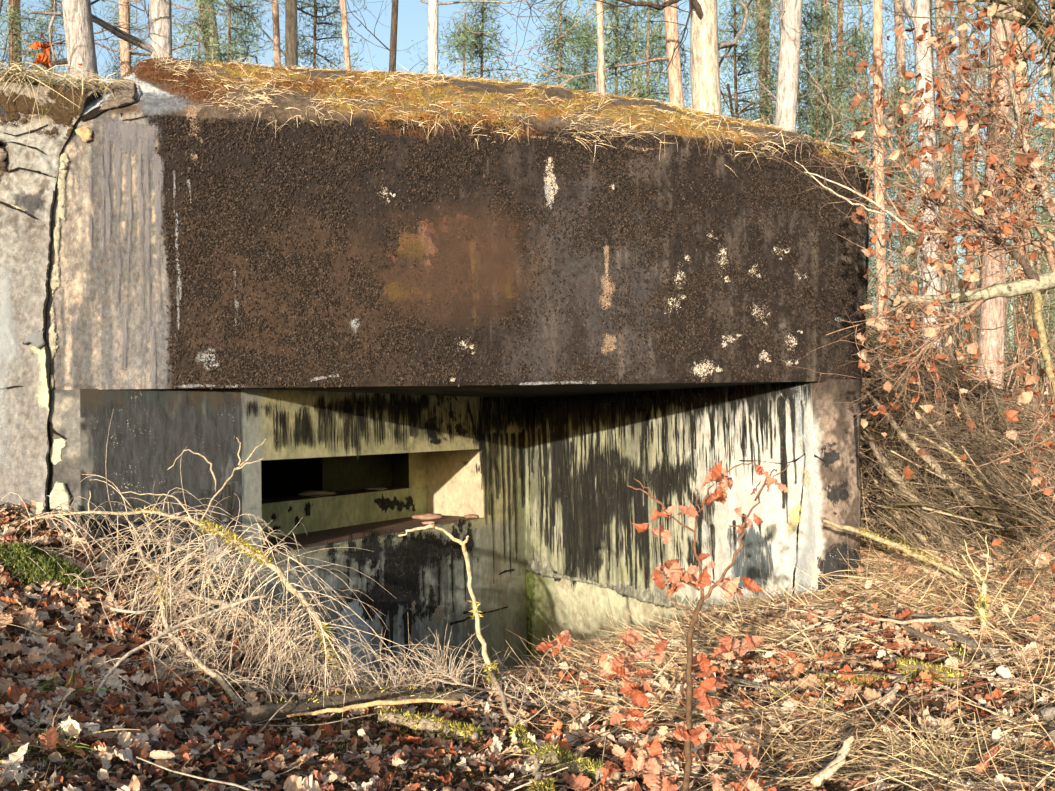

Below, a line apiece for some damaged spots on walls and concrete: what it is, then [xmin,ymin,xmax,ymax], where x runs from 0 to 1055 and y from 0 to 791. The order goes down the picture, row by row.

crack [79,82,144,121]
crack [0,124,67,512]
damp [690,357,723,381]
damp [320,401,421,459]
damp [264,502,313,534]
damp [374,494,416,513]
damp [453,396,682,589]
damp [696,505,715,580]
damp [277,517,478,671]